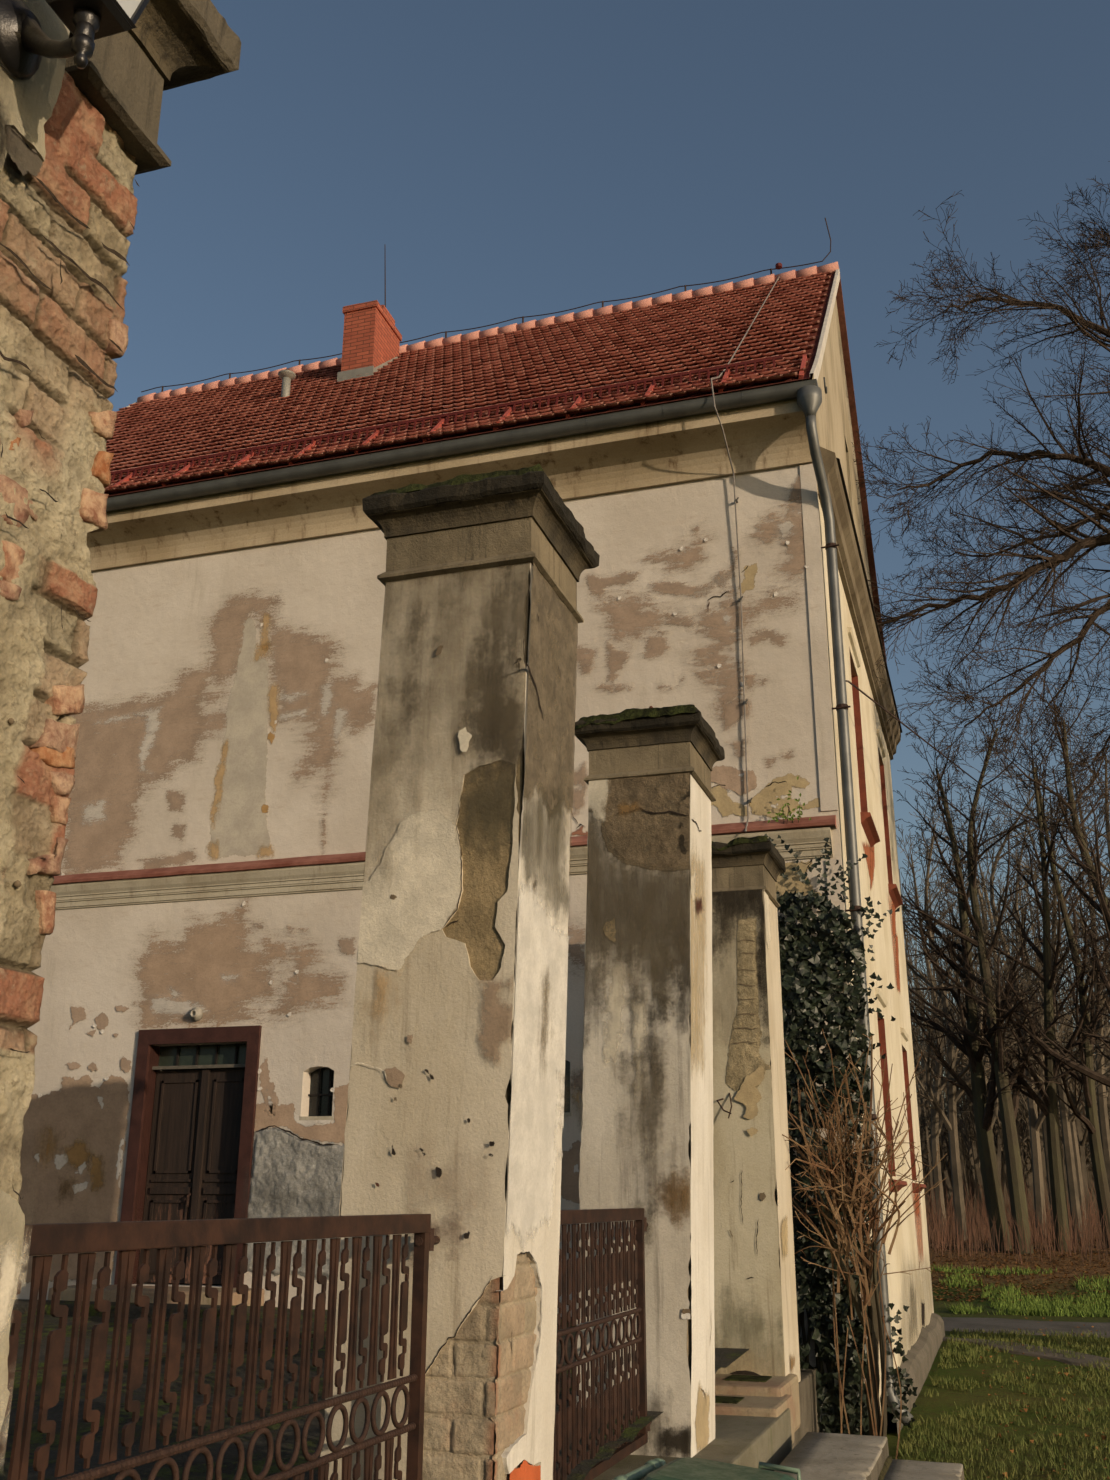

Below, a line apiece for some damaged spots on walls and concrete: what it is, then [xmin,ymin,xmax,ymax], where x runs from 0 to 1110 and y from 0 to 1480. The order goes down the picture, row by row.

peeling [20,1251,115,1283]
flaking render [0,71,378,1224]
peeling [69,476,822,1480]
water stain [522,791,690,1140]